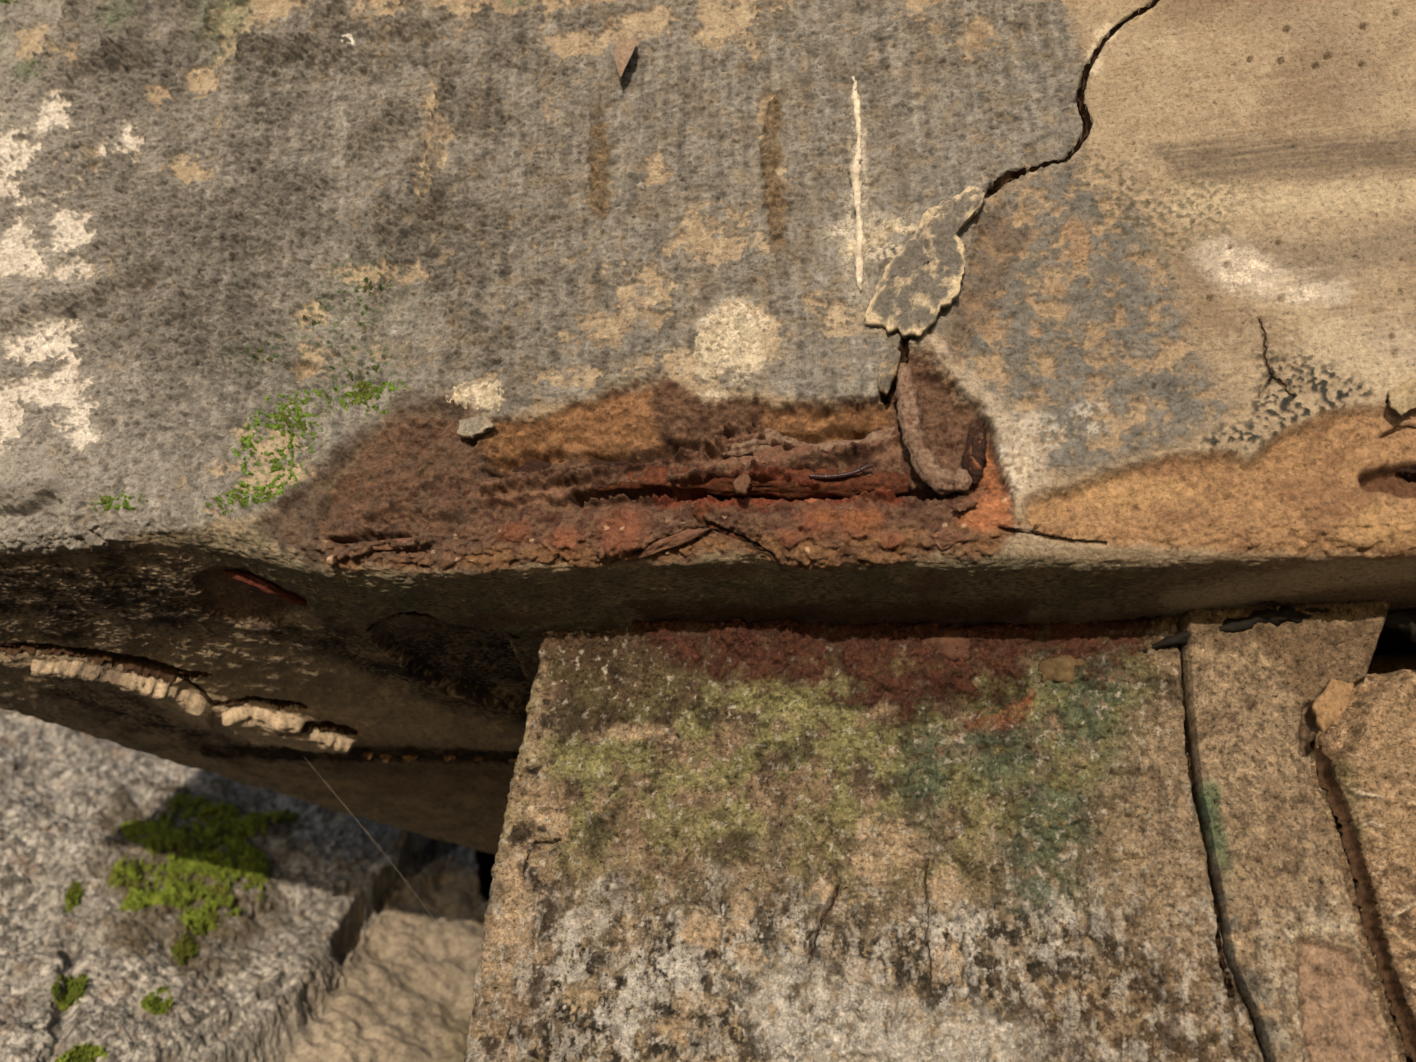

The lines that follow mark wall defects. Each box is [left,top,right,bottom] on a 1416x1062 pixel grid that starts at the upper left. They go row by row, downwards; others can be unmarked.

crack [983,0,1160,196]
spalling [314,185,1416,574]
crack [882,337,909,403]
crack [1178,646,1267,1062]
crack [1310,743,1416,1062]